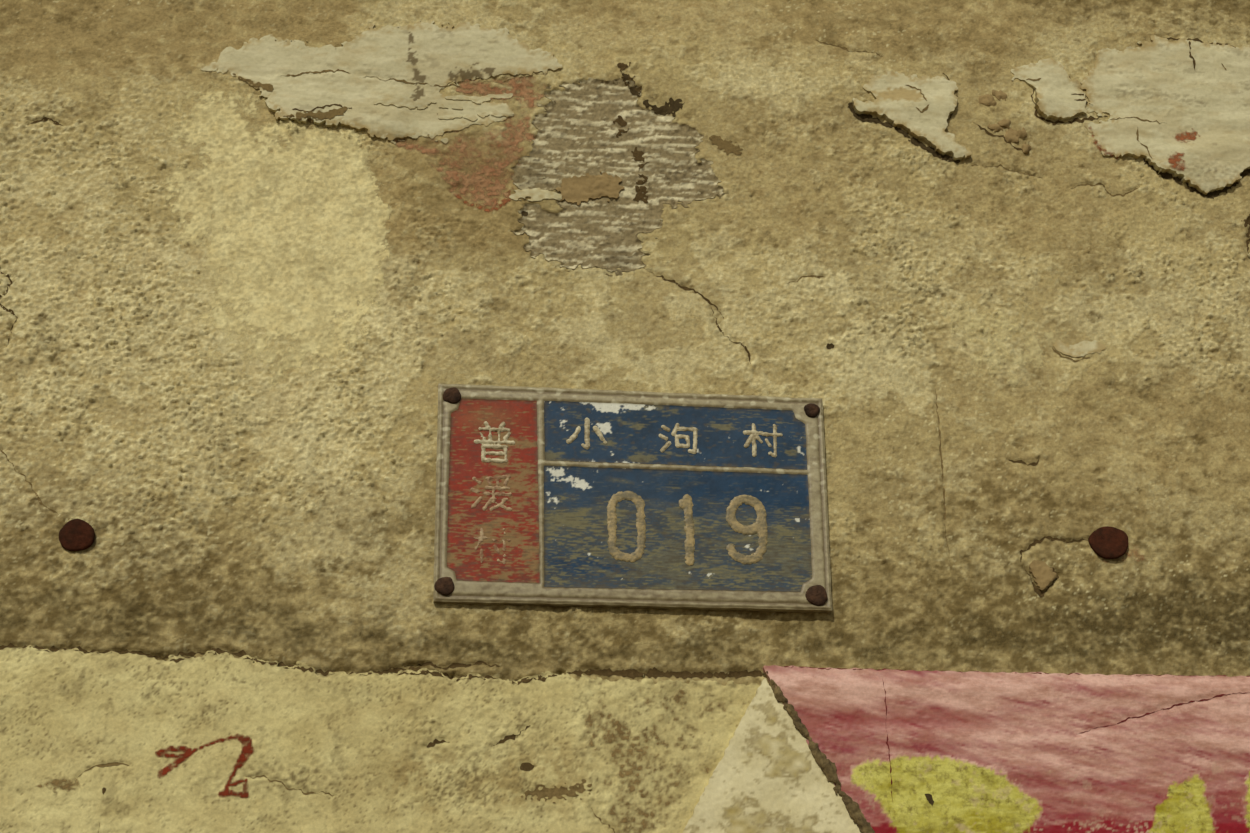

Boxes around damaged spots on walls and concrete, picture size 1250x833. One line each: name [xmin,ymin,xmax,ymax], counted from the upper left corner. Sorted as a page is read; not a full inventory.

crack [32,117,63,126]
flaking render [201,20,743,276]
peeling [848,70,972,163]
peeling [973,35,1250,199]
crack [0,267,17,345]
crack [644,268,751,364]
crack [0,450,58,514]
crack [1020,536,1085,597]